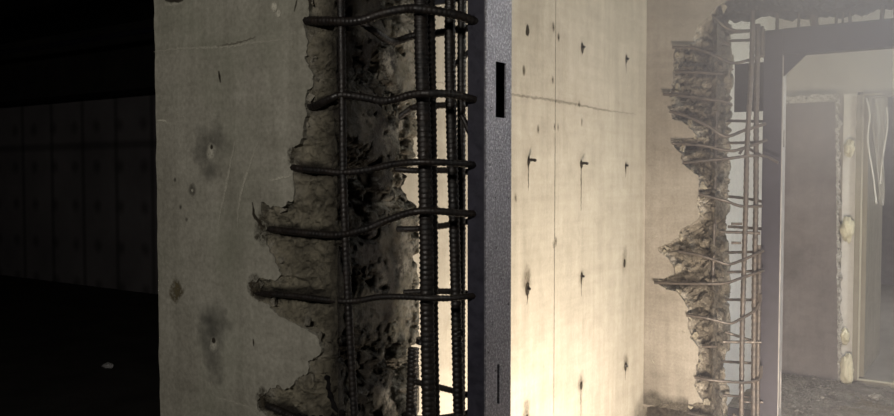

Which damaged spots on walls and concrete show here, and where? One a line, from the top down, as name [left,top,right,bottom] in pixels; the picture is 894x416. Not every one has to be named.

spalling [251,0,478,416]
spalling [647,4,779,416]